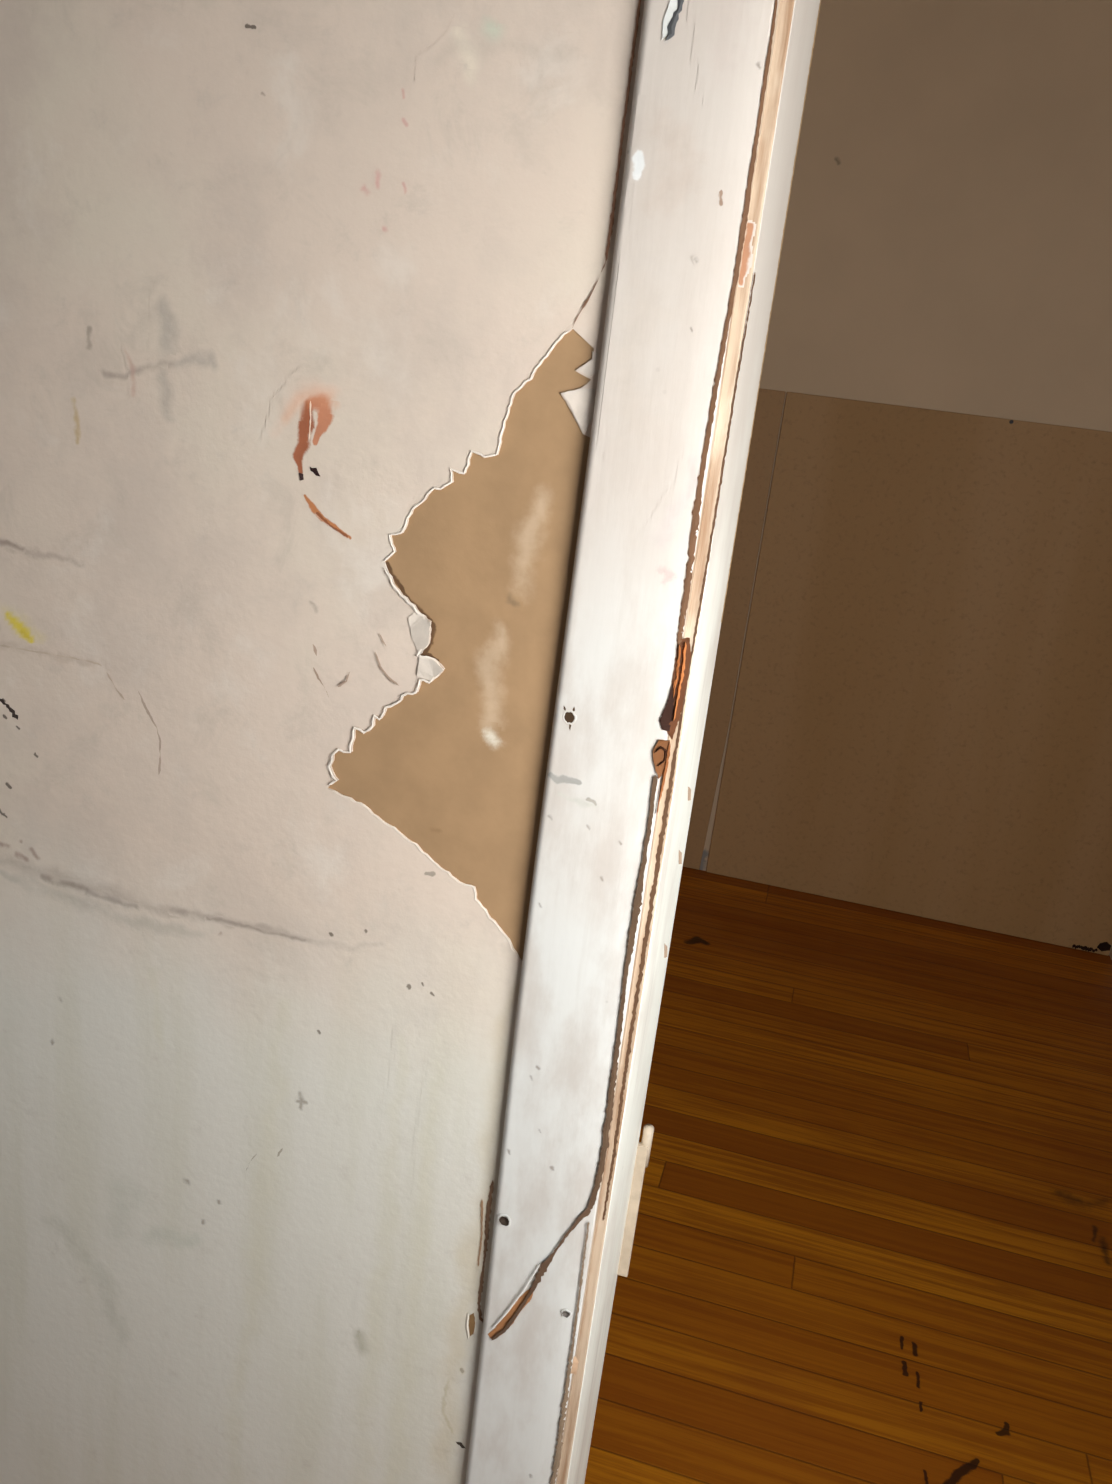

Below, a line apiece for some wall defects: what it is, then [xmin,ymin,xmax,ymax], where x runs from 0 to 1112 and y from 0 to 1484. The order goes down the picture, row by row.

peeling [660,0,684,45]
rust [261,367,353,541]
peeling [327,329,601,961]
crack [477,0,778,1484]
spalling [660,682,677,732]